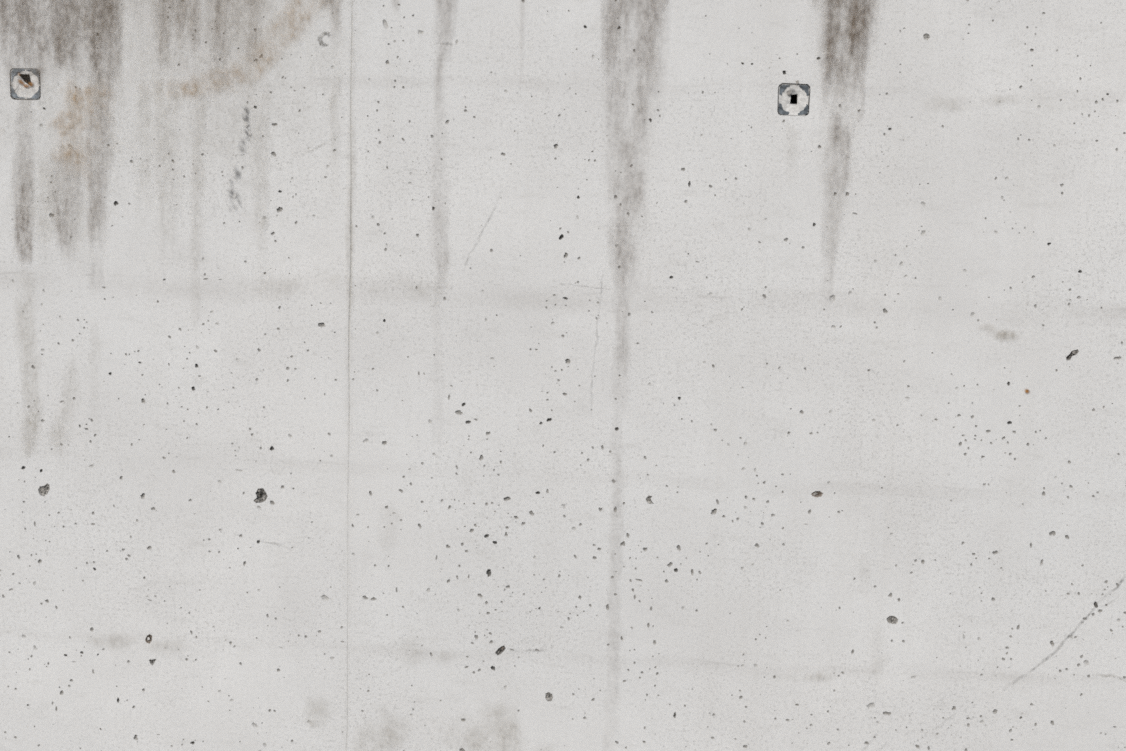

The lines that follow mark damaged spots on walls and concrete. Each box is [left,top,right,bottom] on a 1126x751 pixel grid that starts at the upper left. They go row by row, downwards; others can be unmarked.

damp [836,0,865,53]